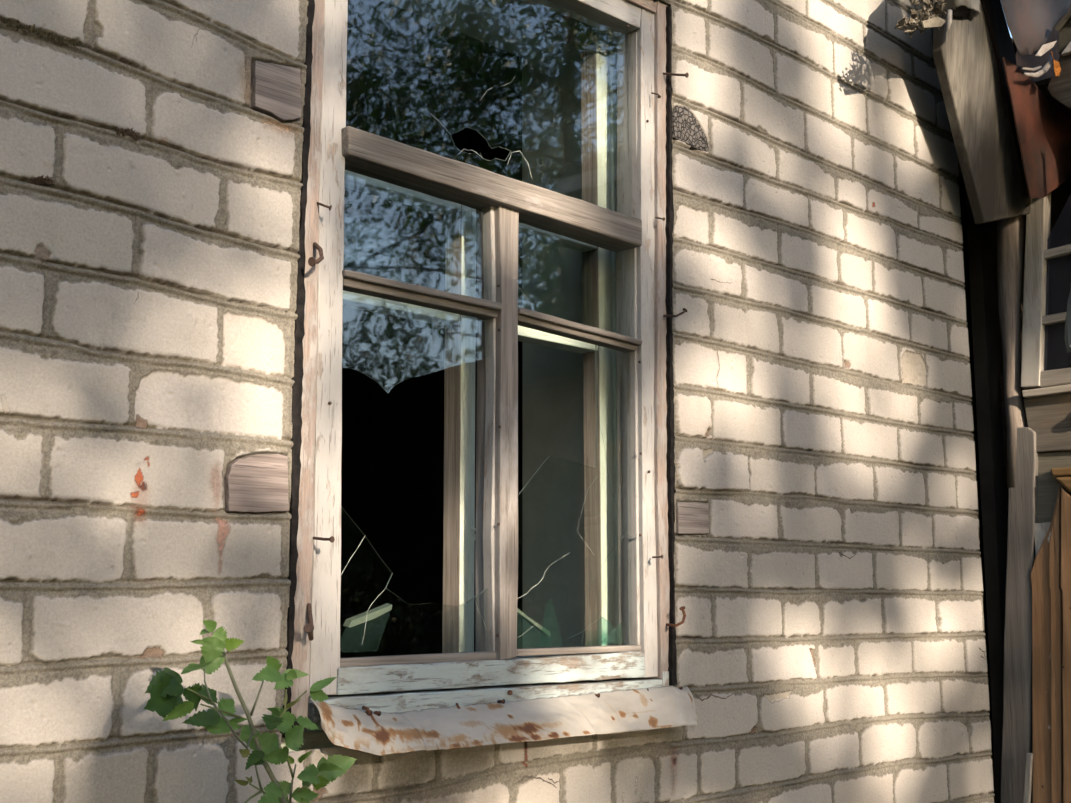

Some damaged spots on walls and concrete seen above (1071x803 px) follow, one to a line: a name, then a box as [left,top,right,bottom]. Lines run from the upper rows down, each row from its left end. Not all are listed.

corrosion [131,457,150,515]